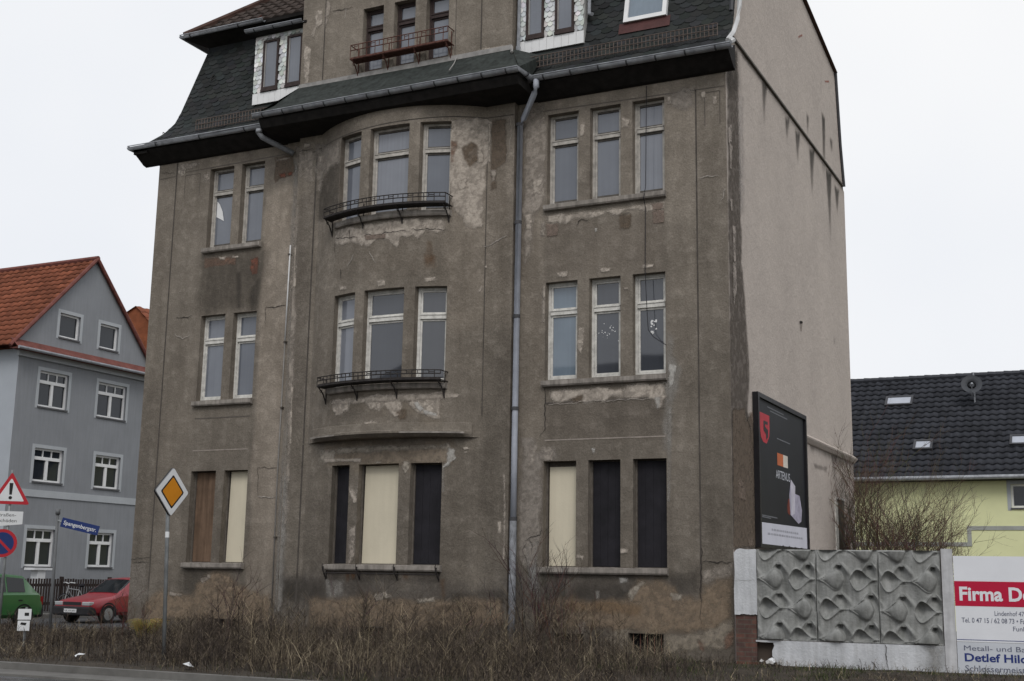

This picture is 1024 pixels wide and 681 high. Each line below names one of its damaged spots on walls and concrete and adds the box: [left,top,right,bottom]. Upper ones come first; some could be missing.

leakage [810,115,832,170]
flaking render [449,118,507,228]
leakage [826,171,839,205]
spalling [335,218,446,247]
leakage [727,53,749,533]
flaking render [331,392,459,424]
spalling [548,383,666,408]